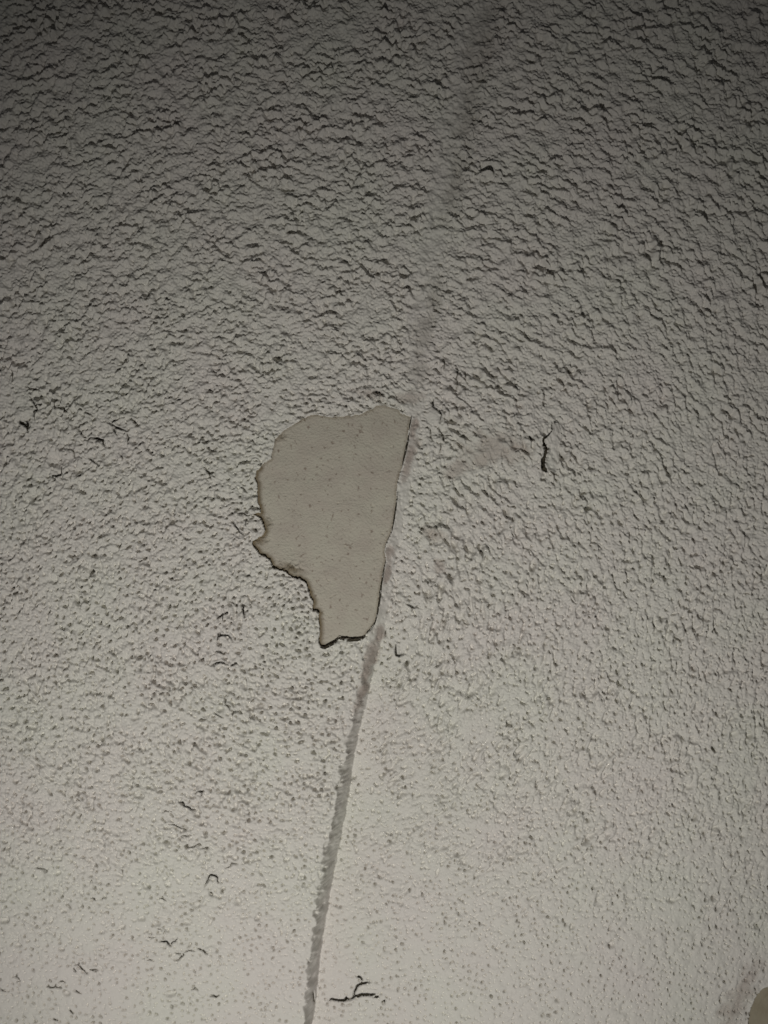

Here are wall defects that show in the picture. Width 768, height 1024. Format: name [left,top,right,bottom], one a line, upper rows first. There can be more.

peeling [250,403,413,650]
crack [313,976,385,1003]